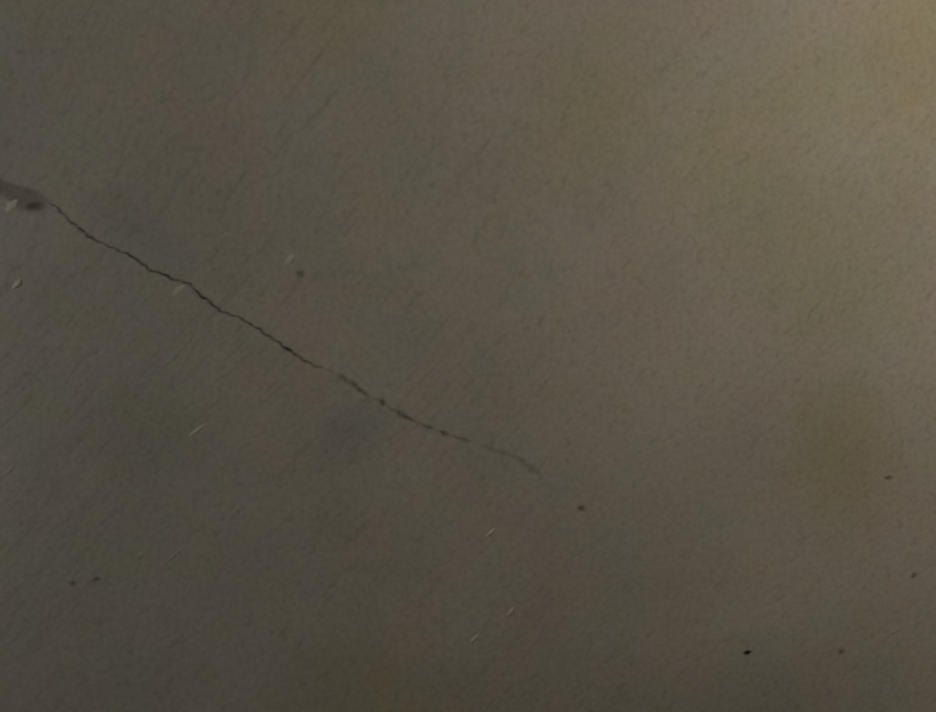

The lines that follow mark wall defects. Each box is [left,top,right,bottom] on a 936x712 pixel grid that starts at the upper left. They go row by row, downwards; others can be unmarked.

crack [118,250,222,312]